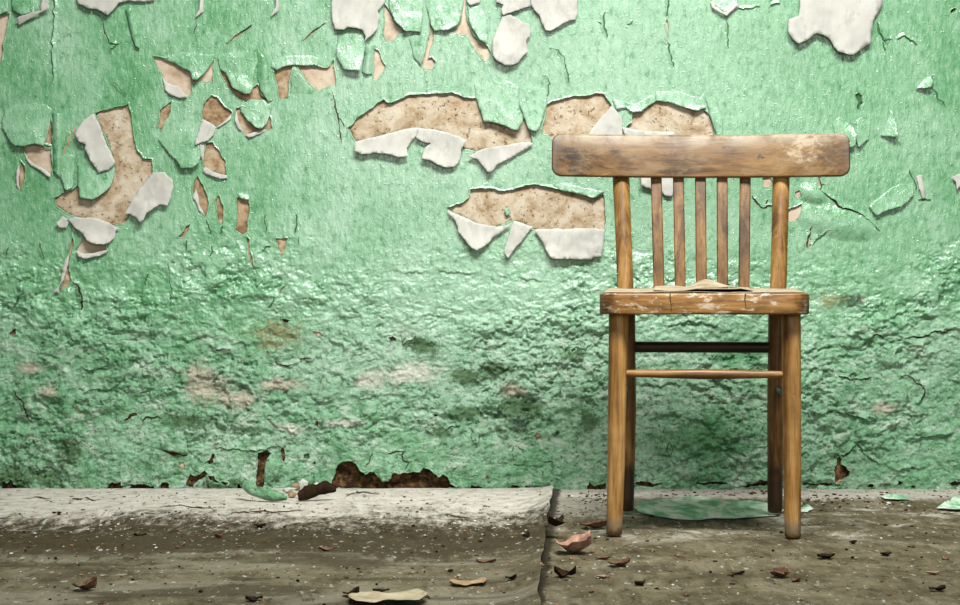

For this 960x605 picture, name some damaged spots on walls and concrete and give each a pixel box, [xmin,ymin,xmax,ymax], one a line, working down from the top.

peeling [788,0,883,55]
peeling [152,0,578,270]
peeling [346,80,723,173]
peeling [2,101,174,310]
peeling [445,182,608,260]
peeling [641,178,673,197]
crack [752,178,772,208]
crack [867,326,953,340]
crack [838,372,872,381]
crack [899,372,925,402]
spalling [330,448,491,488]
spalling [801,442,881,489]